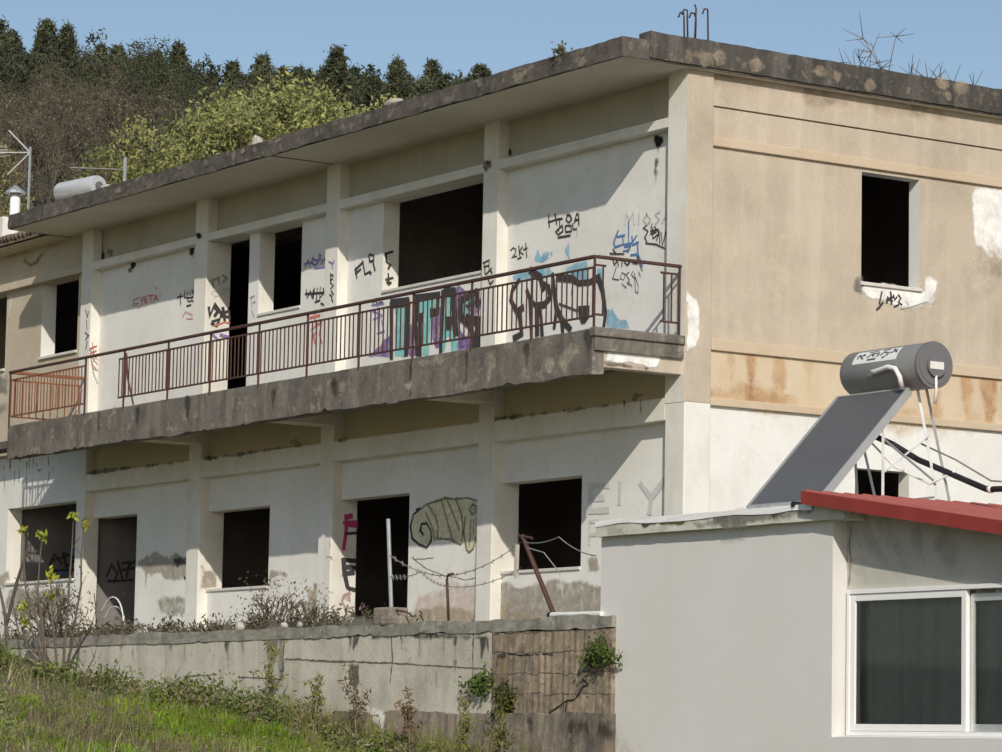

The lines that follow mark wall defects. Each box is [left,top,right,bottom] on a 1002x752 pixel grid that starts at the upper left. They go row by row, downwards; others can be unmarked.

peeling [972,188,1002,274]
peeling [854,275,938,309]
peeling [686,292,700,352]
peeling [139,552,186,580]
peeling [159,597,185,614]
peeling [500,580,601,620]